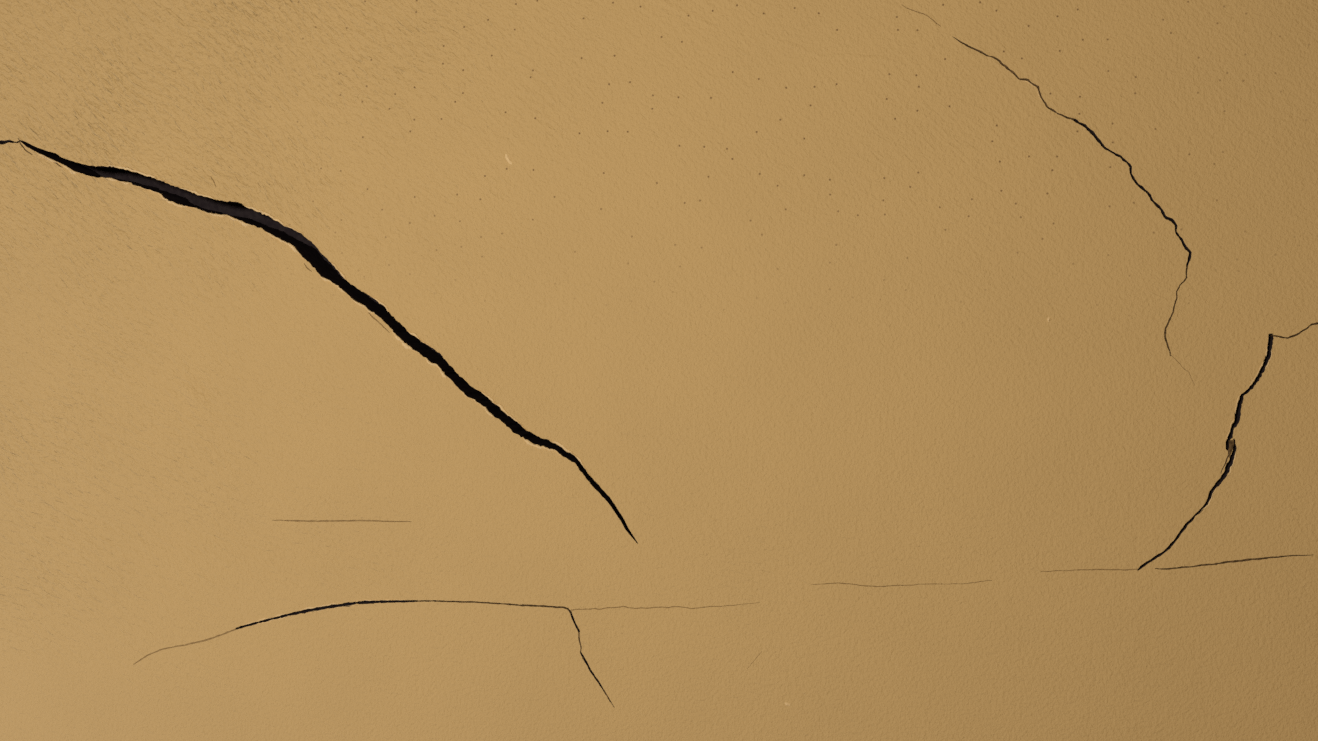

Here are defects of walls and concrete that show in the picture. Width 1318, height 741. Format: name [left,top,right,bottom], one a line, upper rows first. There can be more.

crack [0,138,638,544]
crack [904,6,1194,383]
crack [1041,322,1318,572]
crack [133,599,760,708]